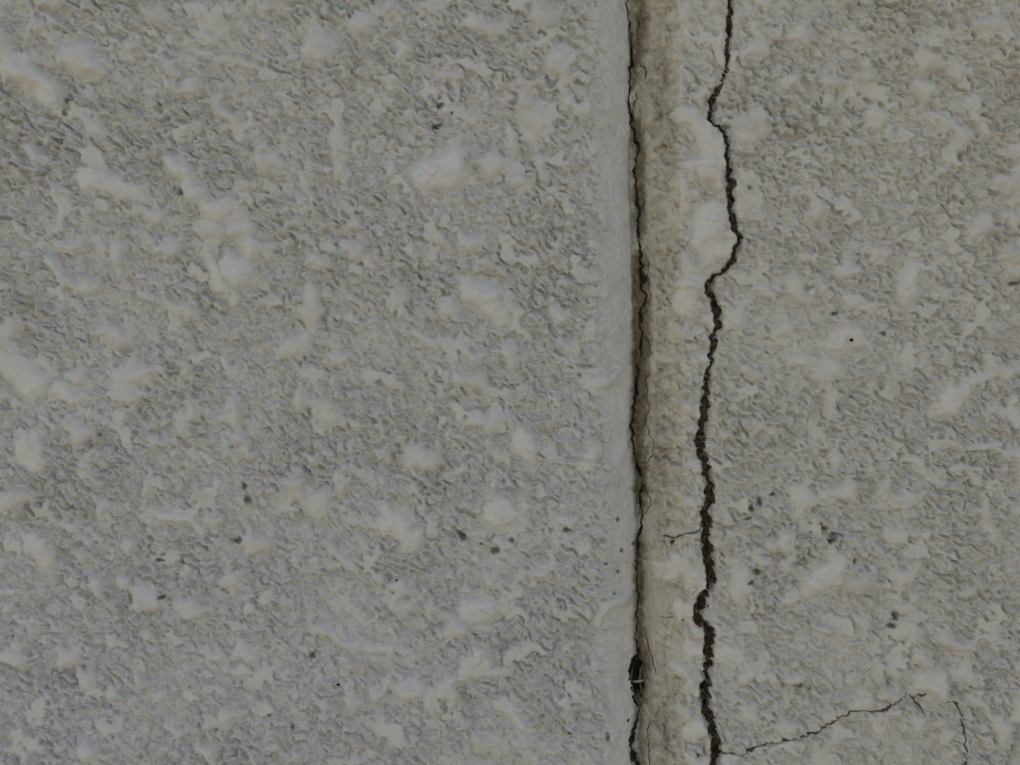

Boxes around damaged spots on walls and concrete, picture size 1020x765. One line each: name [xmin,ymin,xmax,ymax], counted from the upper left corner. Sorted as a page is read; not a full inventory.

crack [626,0,927,765]
crack [949,701,968,765]